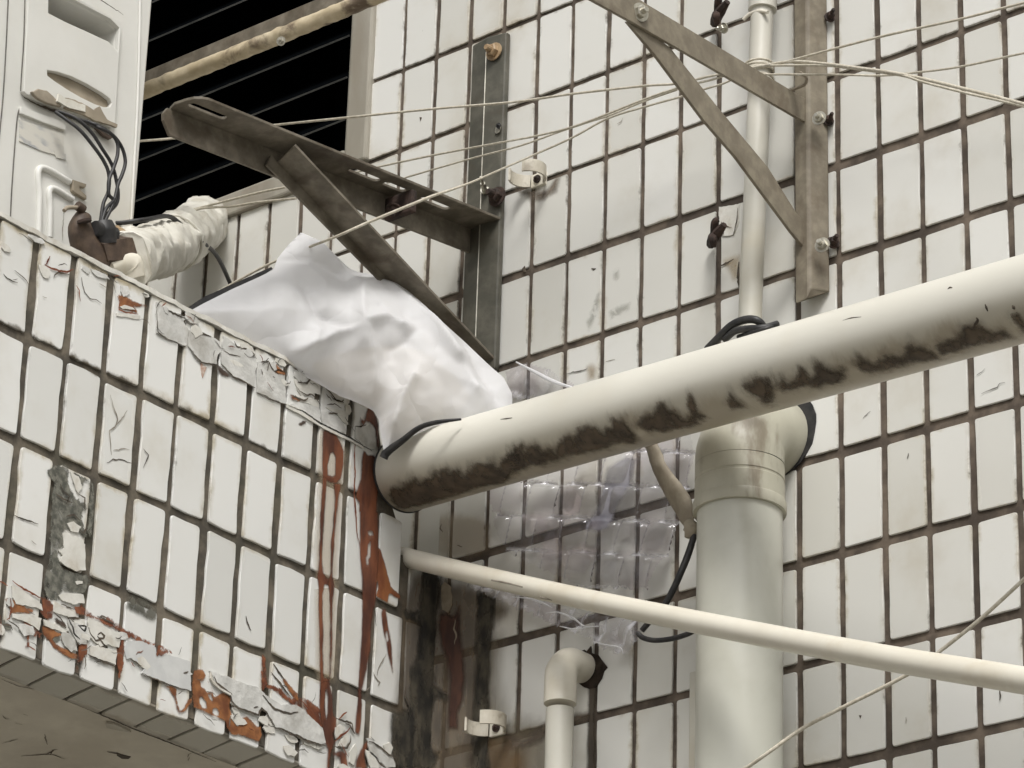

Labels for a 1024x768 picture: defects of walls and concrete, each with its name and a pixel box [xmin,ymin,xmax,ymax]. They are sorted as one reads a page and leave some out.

peeling [81,265,378,451]
spalling [0,465,151,670]
spalling [128,596,157,619]
rust [167,669,262,741]
peeling [229,701,397,768]
rust [261,408,400,768]
water stain [391,572,545,768]